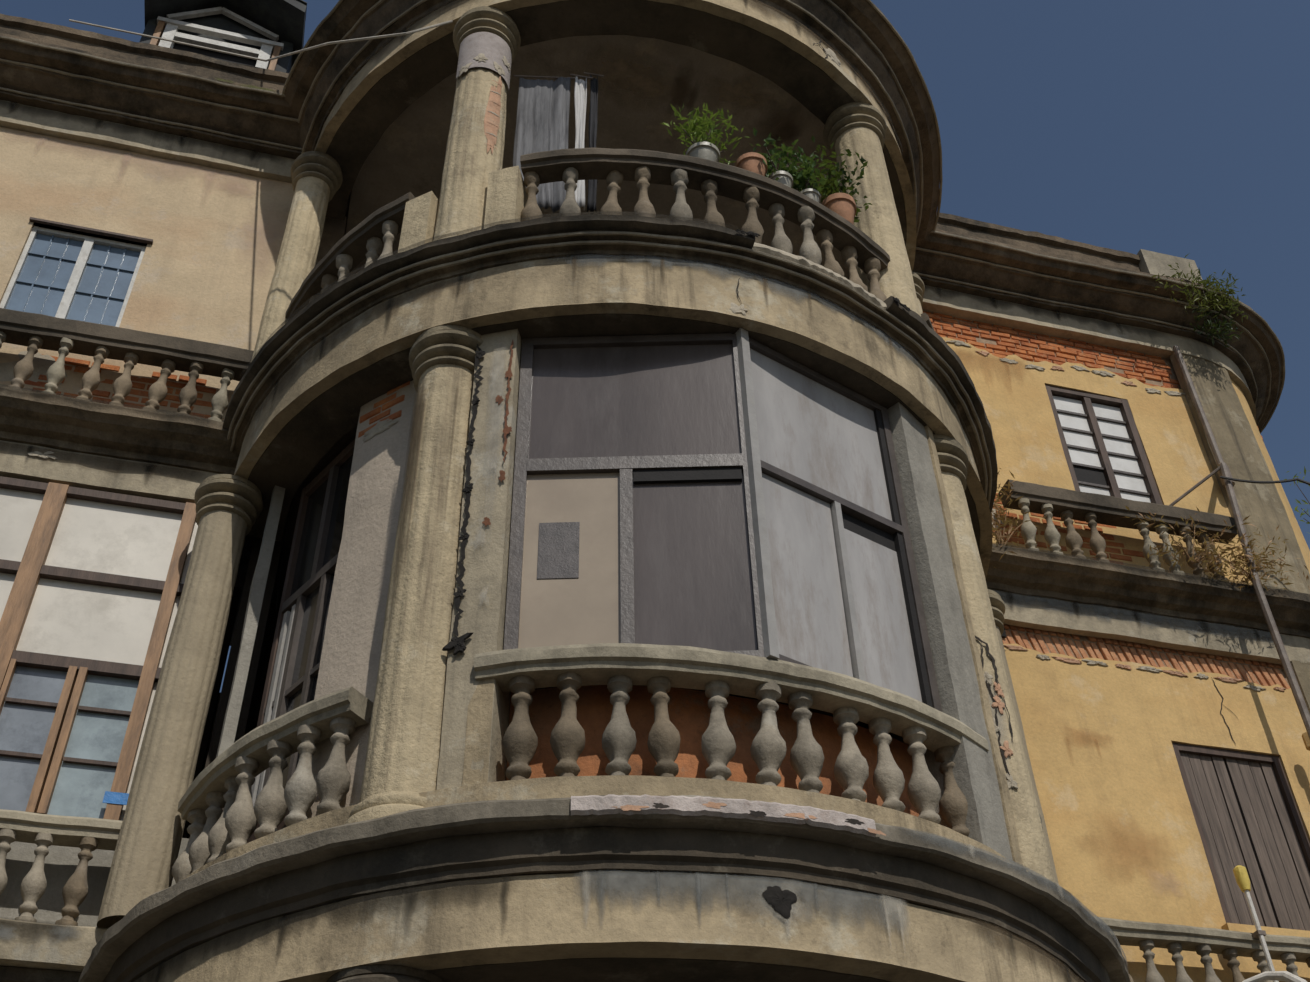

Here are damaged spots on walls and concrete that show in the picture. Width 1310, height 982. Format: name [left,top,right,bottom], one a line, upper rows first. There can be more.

peeling [456,32,512,153]
flaking render [735,229,1185,396]
flaking render [358,381,410,442]
flaking render [1001,624,1290,692]
crack [1211,677,1237,742]
spalling [571,794,886,837]
spalling [762,886,797,919]